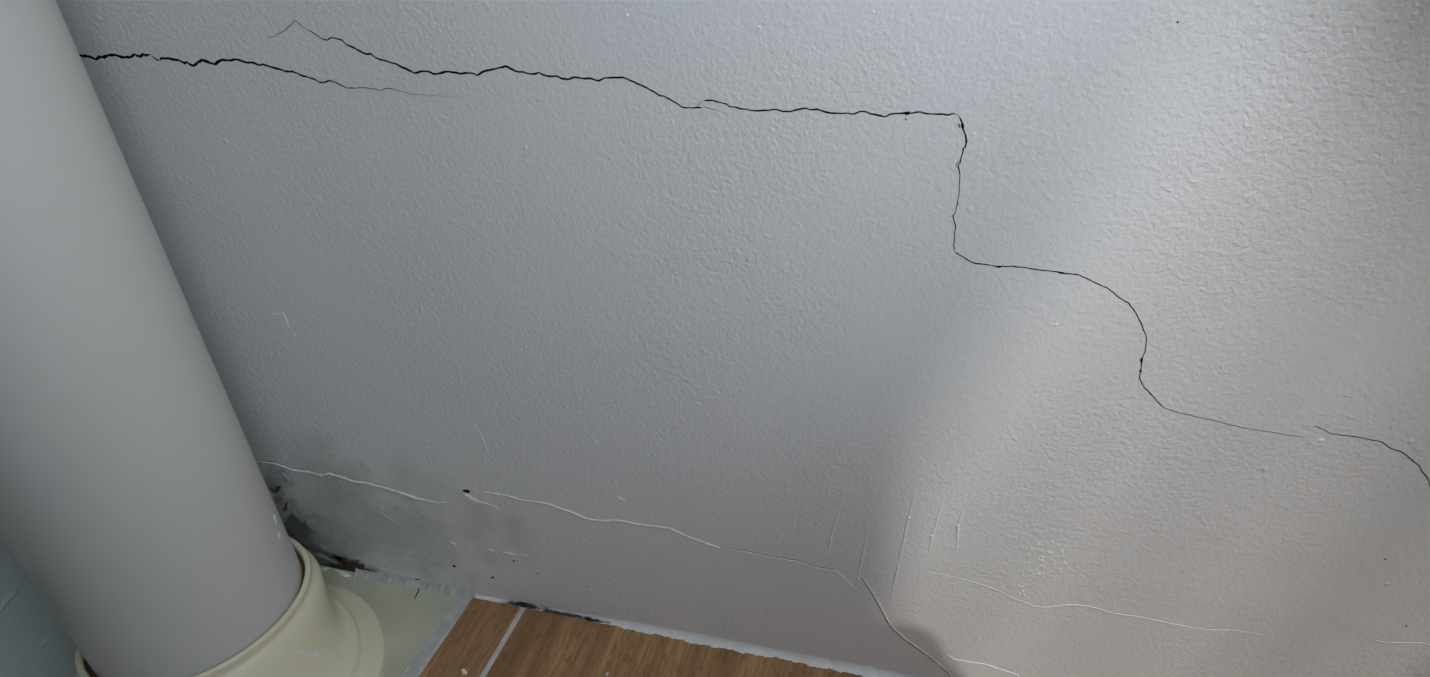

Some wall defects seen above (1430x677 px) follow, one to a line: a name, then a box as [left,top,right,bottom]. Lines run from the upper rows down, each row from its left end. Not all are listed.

crack [79,20,1430,486]
crack [256,460,446,504]
crack [485,492,1019,677]